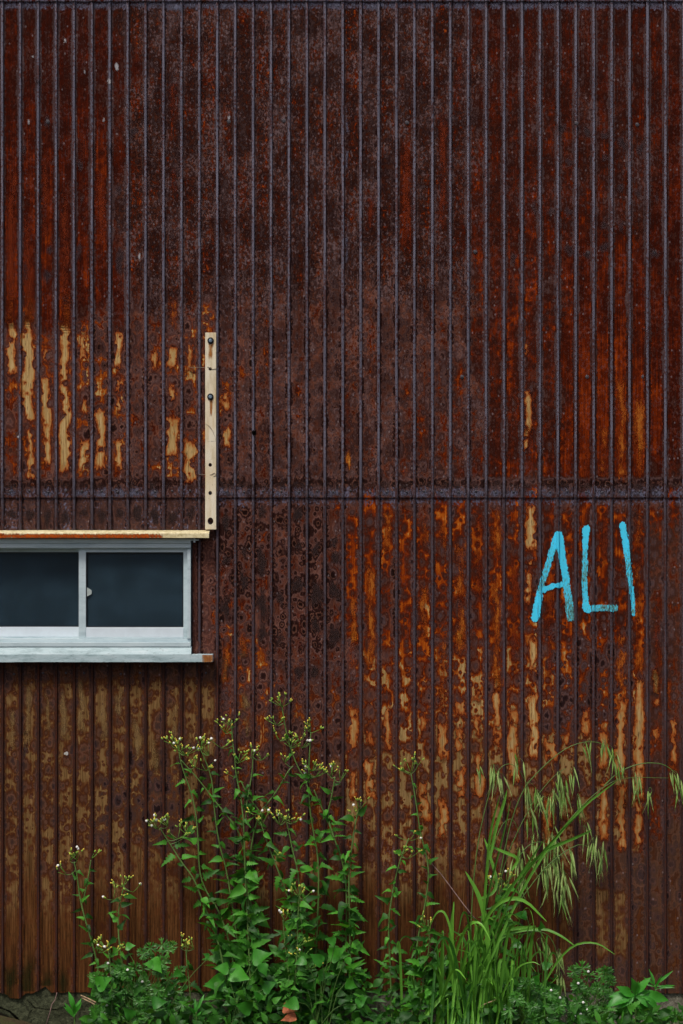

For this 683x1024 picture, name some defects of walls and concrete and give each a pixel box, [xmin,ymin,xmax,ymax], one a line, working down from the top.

peeling [4,317,125,480]
peeling [150,344,198,484]
peeling [222,425,232,448]
corrosion [602,381,647,479]
peeling [523,503,537,605]
corrosion [202,634,246,683]
corrosion [350,566,377,665]
corrosion [424,512,520,696]
peeling [528,636,538,676]
corrosion [615,626,659,687]
peeling [334,704,392,802]
peeling [418,669,678,853]